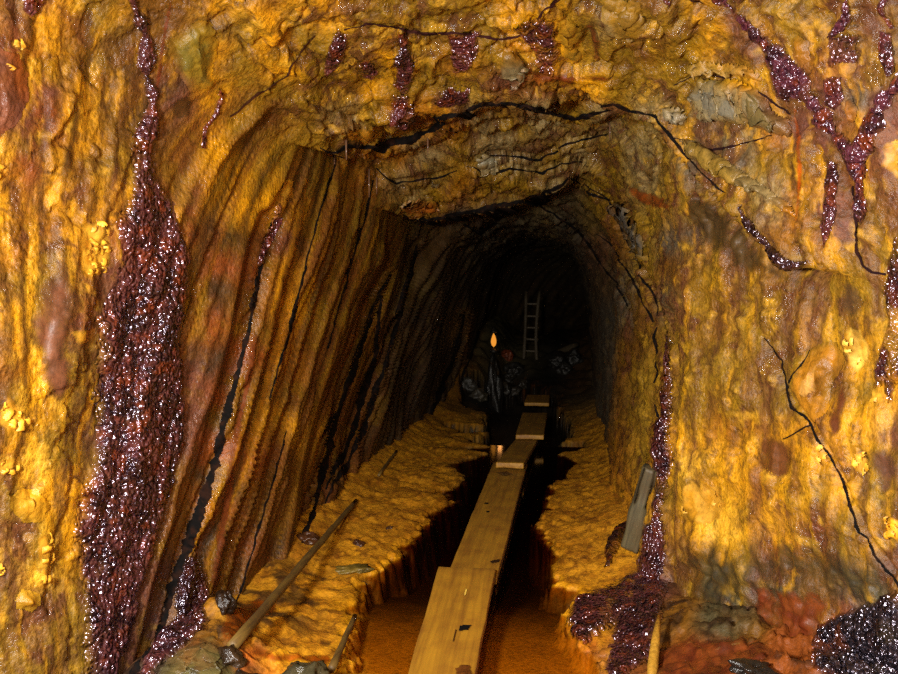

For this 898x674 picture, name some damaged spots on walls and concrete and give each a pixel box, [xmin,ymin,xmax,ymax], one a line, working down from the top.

crack [344,23,520,62]
crack [538,0,559,19]
crack [673,75,790,115]
crack [851,186,885,276]
crack [269,102,771,543]
crack [129,263,264,674]
crack [236,431,287,601]
crack [764,338,898,588]